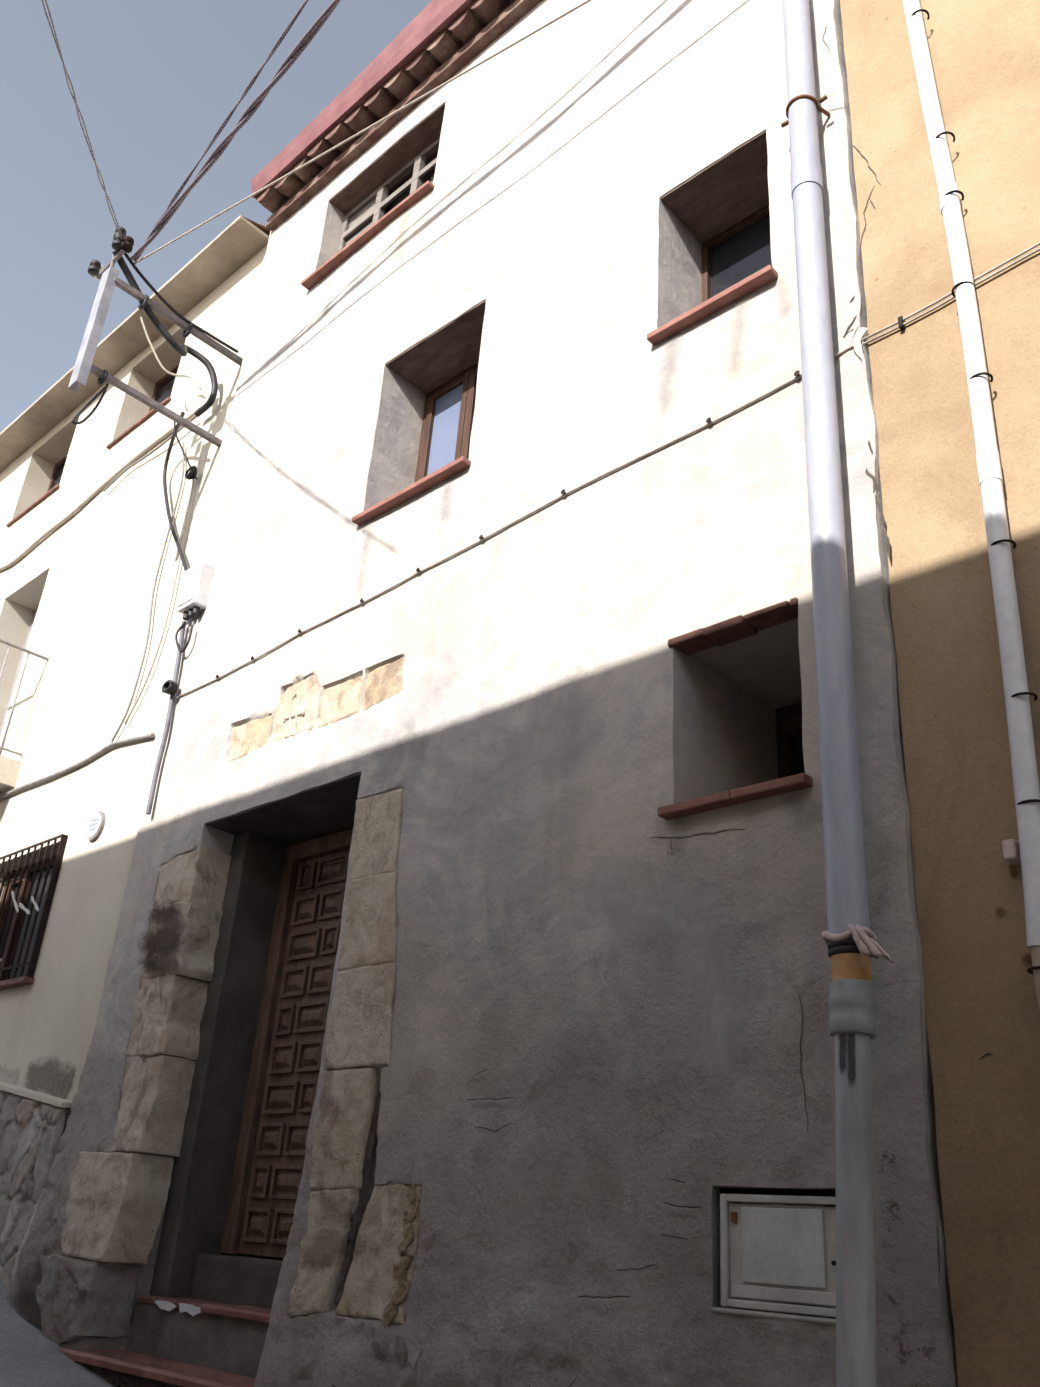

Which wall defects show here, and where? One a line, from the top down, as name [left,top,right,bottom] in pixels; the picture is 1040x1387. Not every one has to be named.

crack [650,829,744,855]
crack [799,995,808,1131]